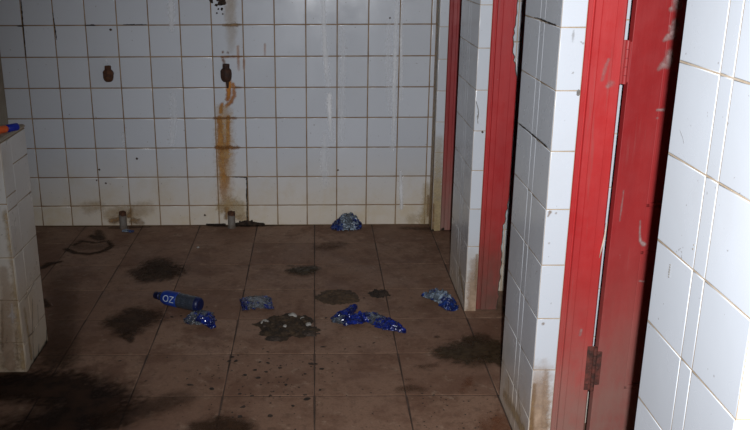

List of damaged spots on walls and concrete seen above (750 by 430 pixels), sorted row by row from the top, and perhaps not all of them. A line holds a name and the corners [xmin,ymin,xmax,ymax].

corrosion [214,82,240,188]
damp [503,380,551,430]